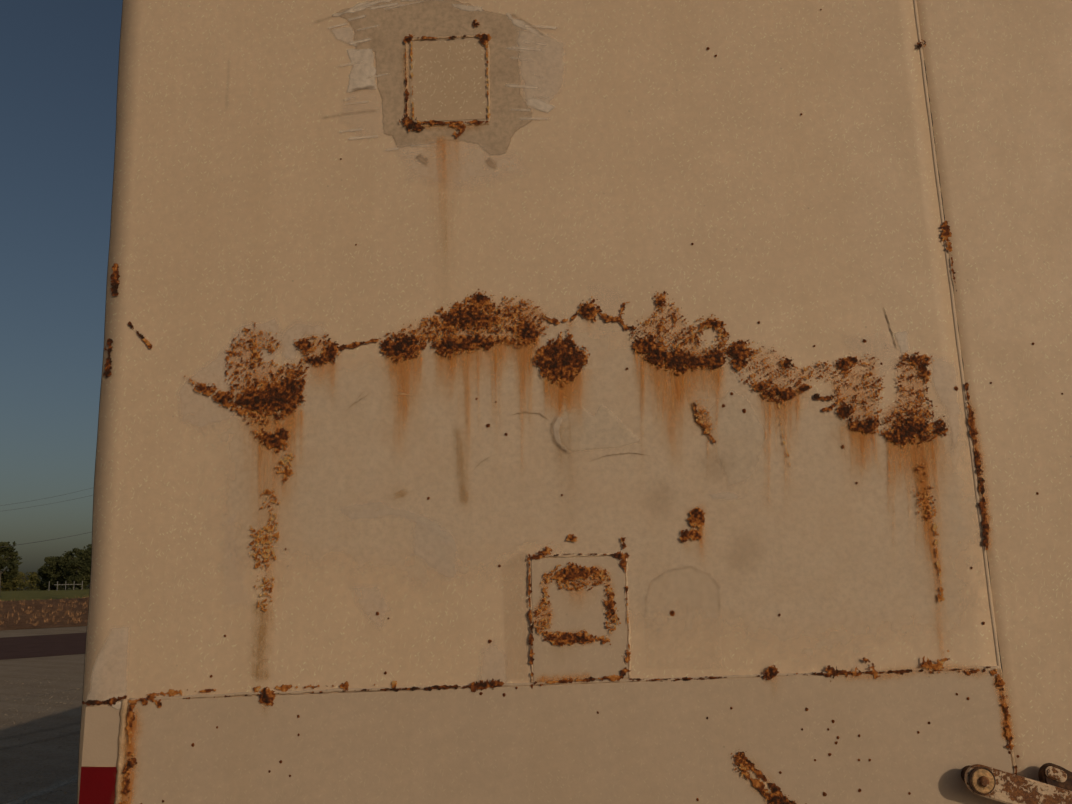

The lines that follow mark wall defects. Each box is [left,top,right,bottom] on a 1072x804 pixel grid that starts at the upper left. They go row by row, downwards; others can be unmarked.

peeling [329,0,562,155]
rust [399,19,492,138]
rust [184,289,948,612]
rust [954,383,990,550]
rust [119,675,230,804]
rust [245,681,349,706]
rust [361,671,518,697]
rust [527,534,727,688]
rust [731,752,796,804]
rust [757,665,779,680]
rust [796,650,1019,775]